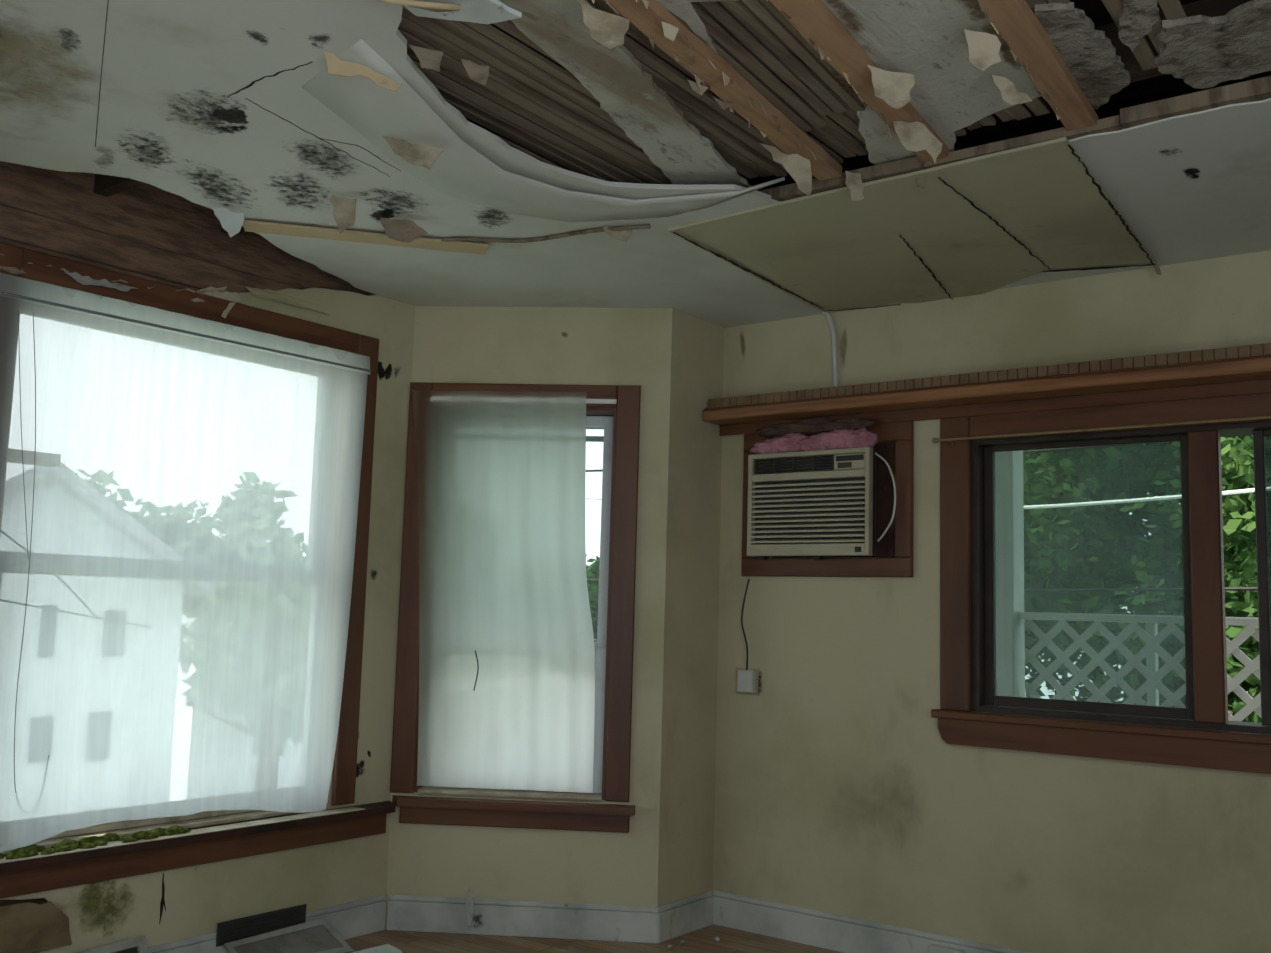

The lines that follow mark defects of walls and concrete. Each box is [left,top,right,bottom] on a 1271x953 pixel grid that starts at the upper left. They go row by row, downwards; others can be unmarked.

flaking render [577,0,630,49]
flaking render [408,44,443,72]
flaking render [964,0,1060,120]
mould [118,136,169,168]
mould [169,91,248,133]
flaking render [687,59,831,197]
flaking render [843,65,942,163]
mould [186,170,250,206]
mould [272,145,351,209]
mould [361,190,427,220]
mould [476,209,506,226]
flaking render [0,899,72,953]